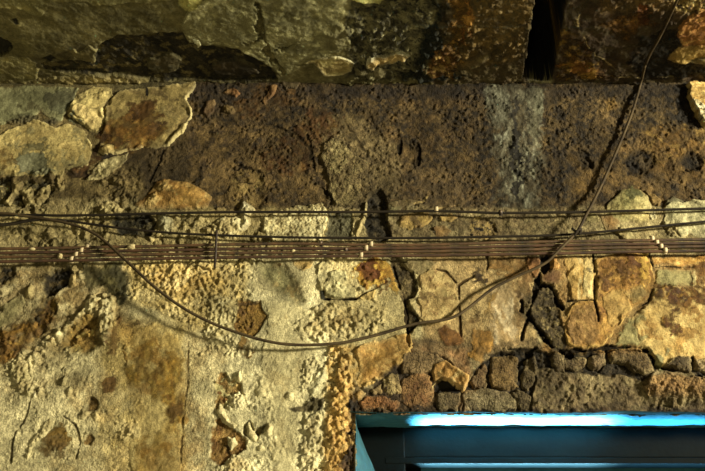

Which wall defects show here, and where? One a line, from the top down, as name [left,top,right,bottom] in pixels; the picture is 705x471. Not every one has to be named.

efflorescence [485,83,544,209]
spalling [0,267,15,285]
spalling [33,266,72,333]
spalling [65,313,99,353]
crack [320,290,373,301]
peeling [354,253,705,413]
crack [509,254,705,378]